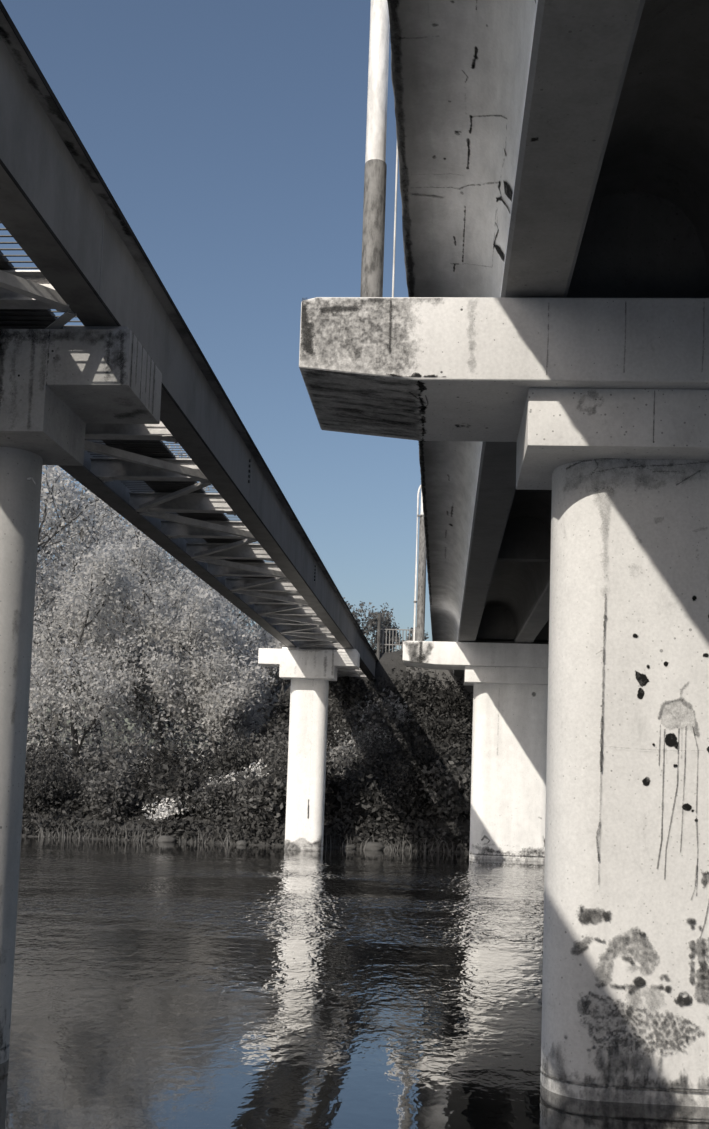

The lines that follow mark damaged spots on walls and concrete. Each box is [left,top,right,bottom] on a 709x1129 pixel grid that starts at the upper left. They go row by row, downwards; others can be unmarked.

crack [435,115,507,271]
damp [657,699,698,874]
damp [539,1044,709,1104]